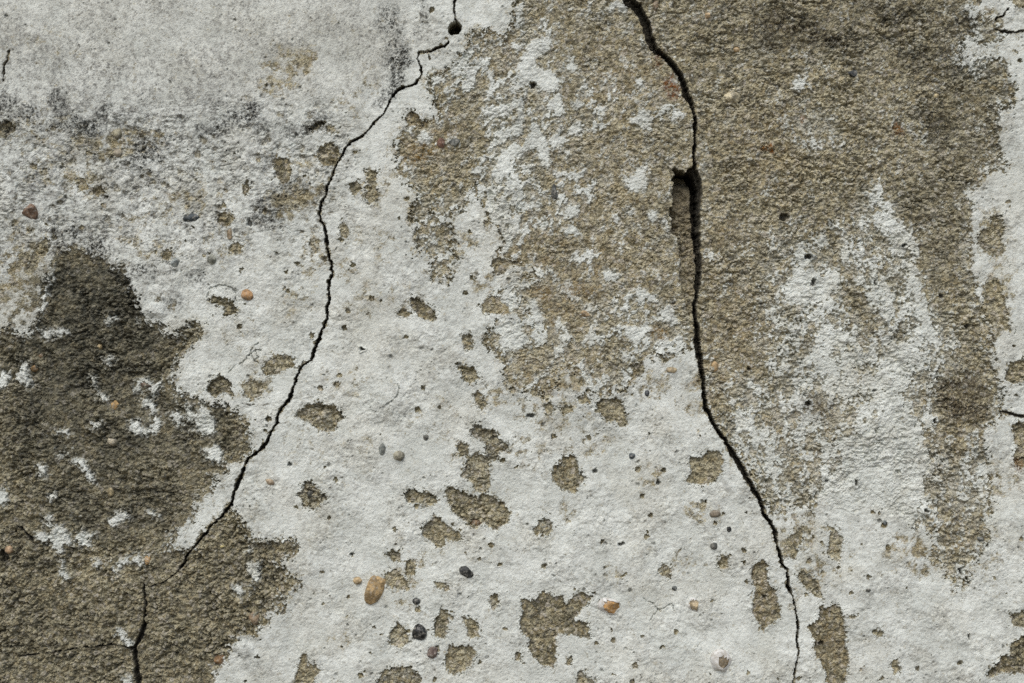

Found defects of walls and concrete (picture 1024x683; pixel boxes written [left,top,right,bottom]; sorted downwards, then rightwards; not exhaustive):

crack [993,7,1024,35]
peeling [0,237,300,683]
crack [17,0,459,683]
spalling [295,400,346,433]
peeling [397,0,1024,587]
crack [622,0,800,683]
peeling [514,590,597,683]
peeling [750,559,783,634]
peeling [784,525,859,683]